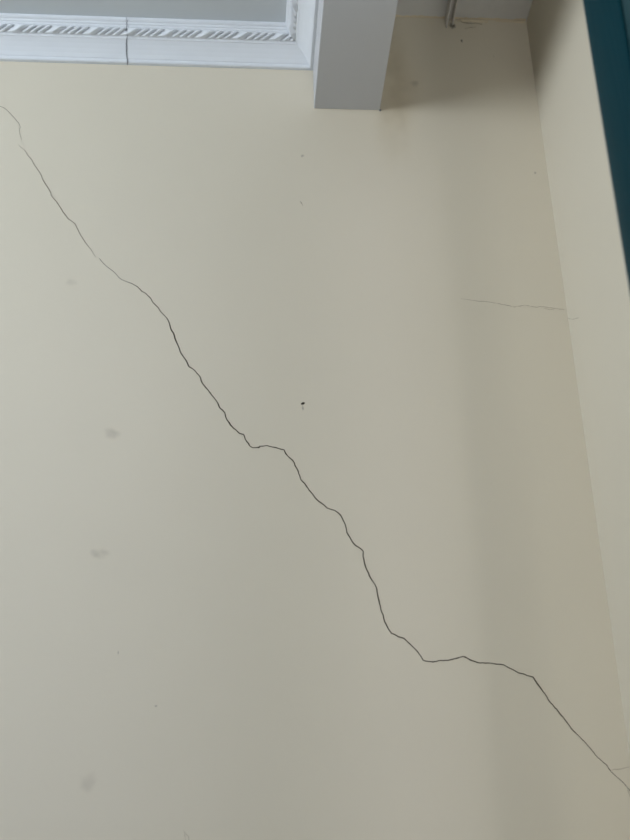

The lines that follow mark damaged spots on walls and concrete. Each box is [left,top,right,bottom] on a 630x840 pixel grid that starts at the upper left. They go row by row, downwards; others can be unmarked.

crack [22,148,630,795]